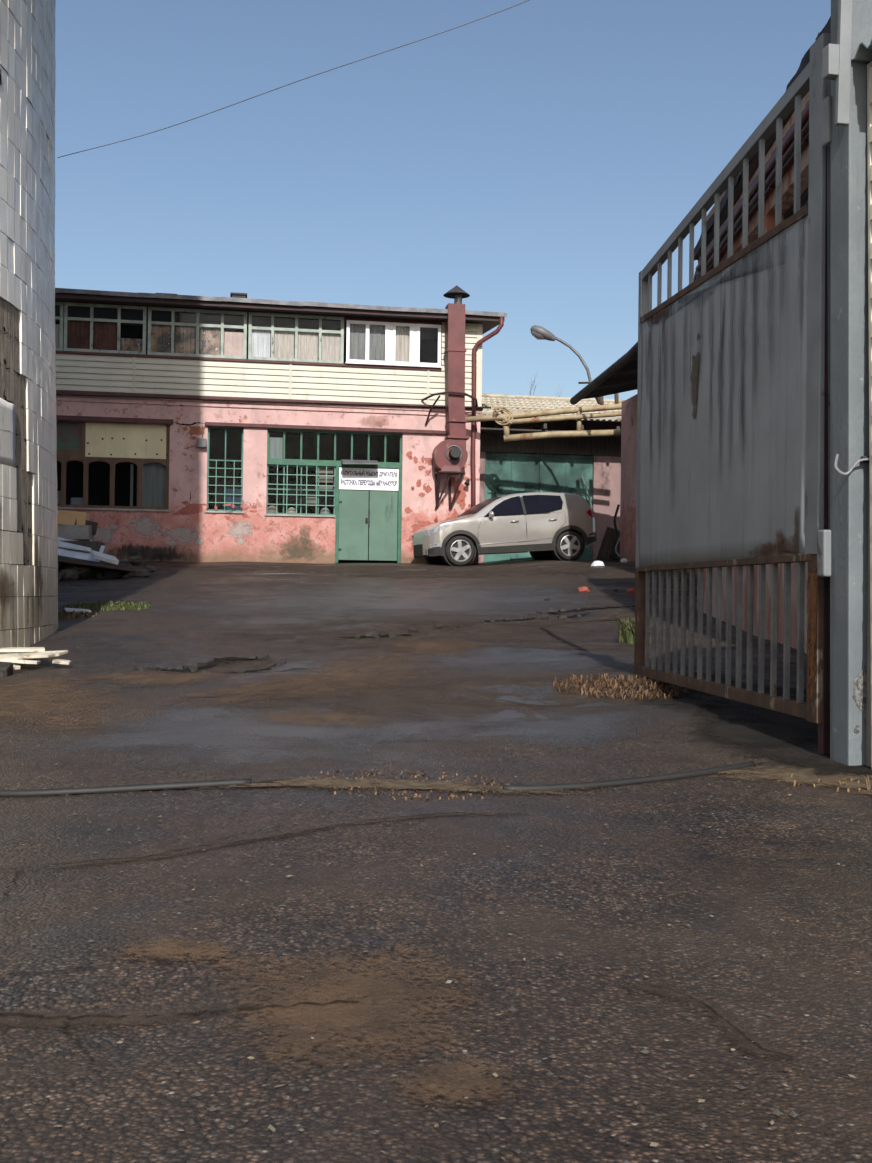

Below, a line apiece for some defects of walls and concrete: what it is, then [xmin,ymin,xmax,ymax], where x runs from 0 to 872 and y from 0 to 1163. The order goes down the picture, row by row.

spalling [0,298,32,566]
flaking render [131,501,257,546]
peeling [404,451,471,552]
rust [756,511,798,556]
water stain [0,543,43,635]
rust [807,571,819,702]
crack [1,812,466,899]
crack [0,1000,359,1063]